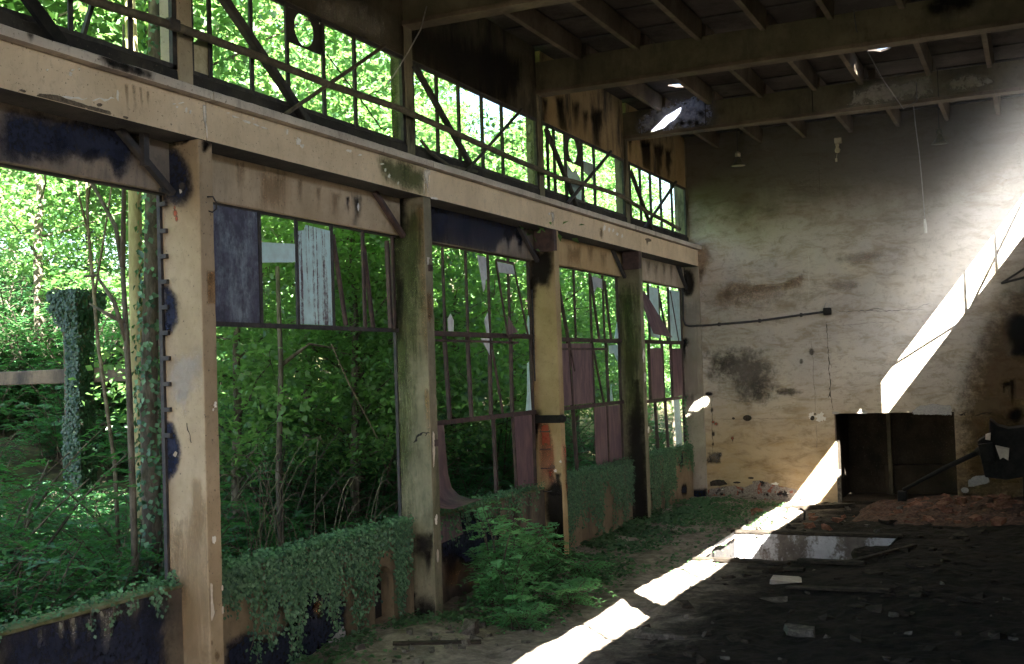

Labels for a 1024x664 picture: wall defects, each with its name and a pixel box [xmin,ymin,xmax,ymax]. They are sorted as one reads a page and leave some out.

water stain [572,102,602,145]
water stain [653,145,671,177]
water stain [712,349,797,401]
crack [800,303,931,434]
water stain [956,294,1024,498]
spalling [708,477,803,502]